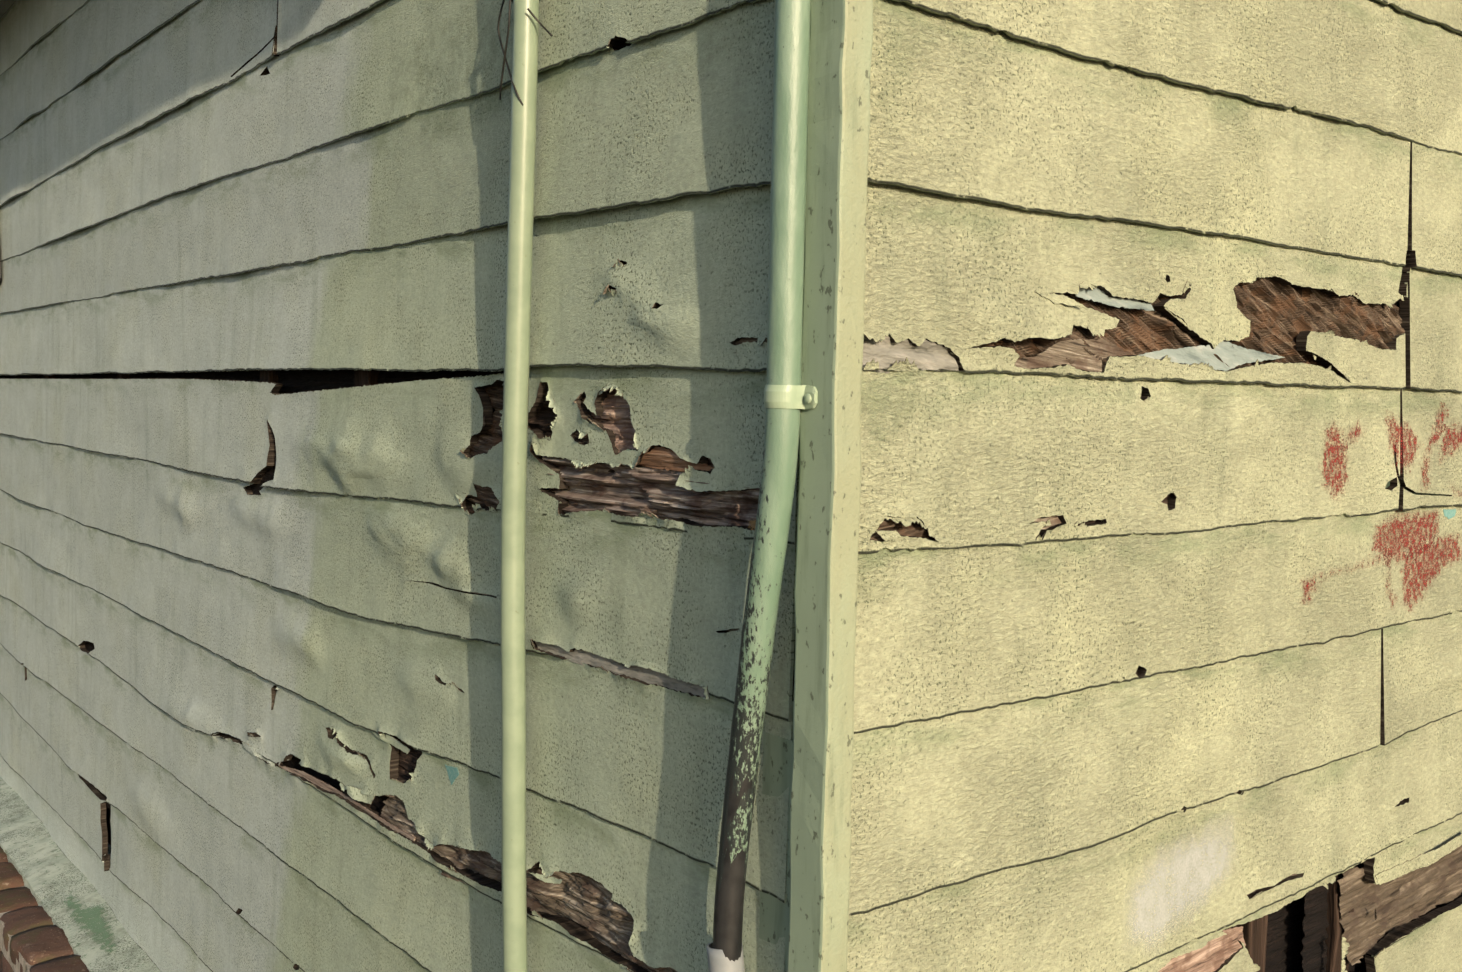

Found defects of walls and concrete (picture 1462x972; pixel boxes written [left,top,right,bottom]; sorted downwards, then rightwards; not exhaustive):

peeling [974,278,1405,380]
spalling [460,383,504,460]
peeling [528,383,760,526]
spalling [455,484,499,516]
spalling [373,732,422,784]
peeling [340,782,376,805]
peeling [529,862,563,884]
peeling [1354,834,1462,883]
peeling [1159,926,1246,972]
spalling [1254,876,1462,972]